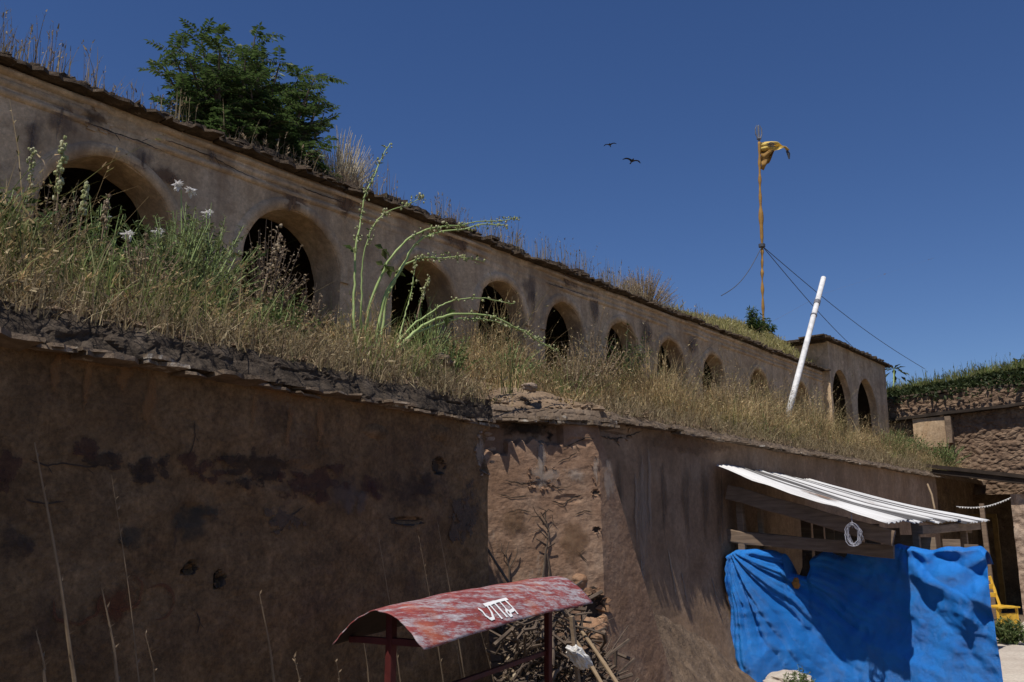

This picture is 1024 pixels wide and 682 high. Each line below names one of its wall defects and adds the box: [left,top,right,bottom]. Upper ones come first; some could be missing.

spalling [474,422,553,476]